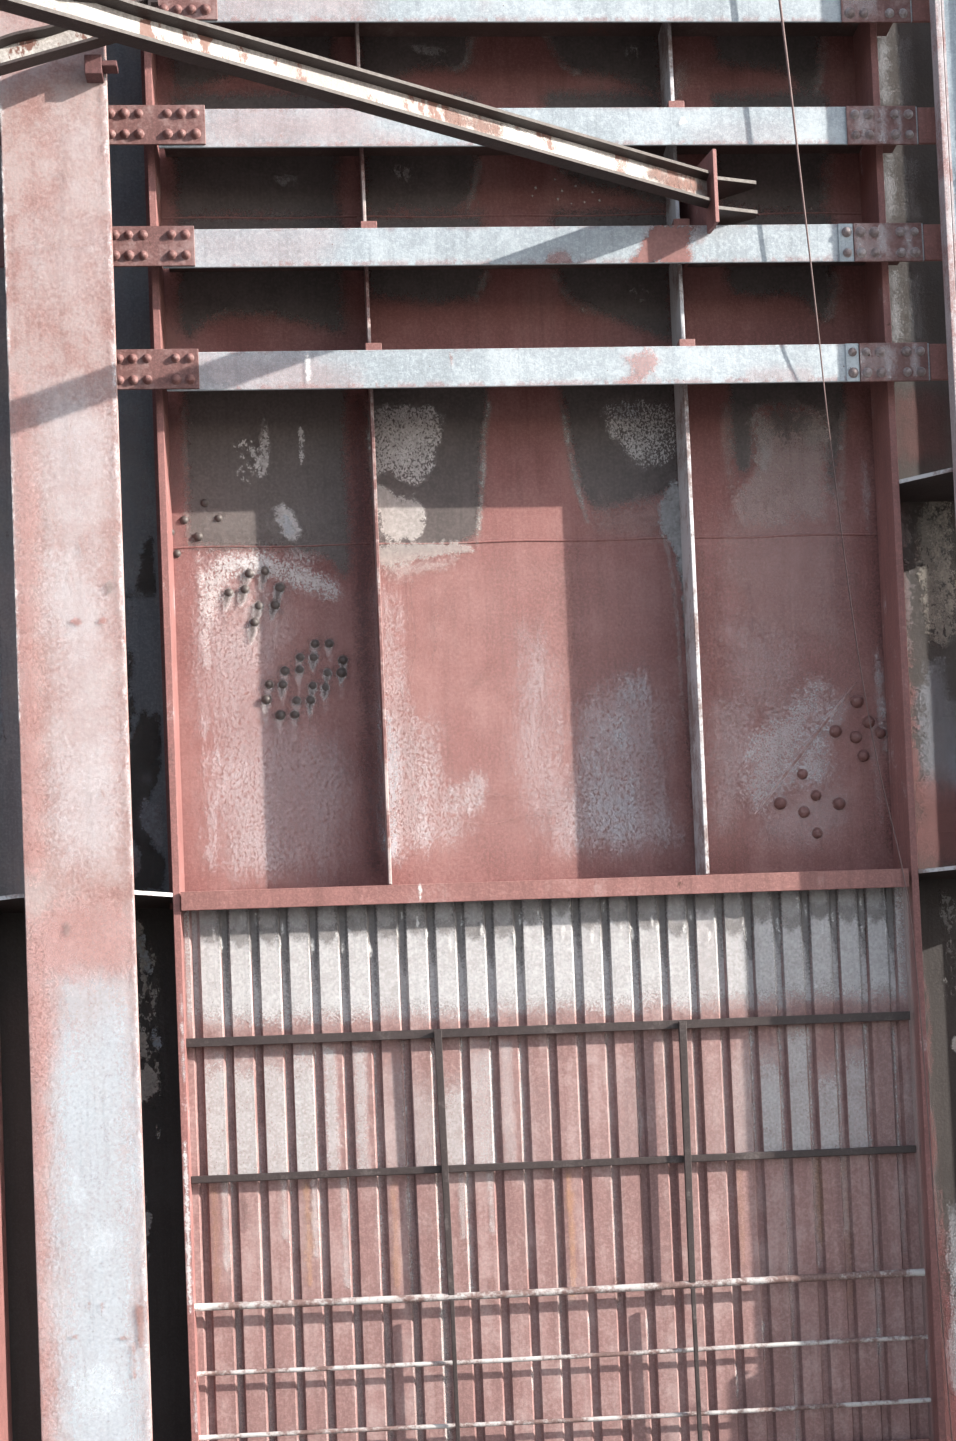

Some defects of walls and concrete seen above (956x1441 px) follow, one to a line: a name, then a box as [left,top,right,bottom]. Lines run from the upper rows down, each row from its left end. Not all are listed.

corrosion [632,225,694,263]
corrosion [622,350,658,384]
peeling [366,387,489,558]
peeling [135,919,162,1102]
peeling [184,887,907,1022]